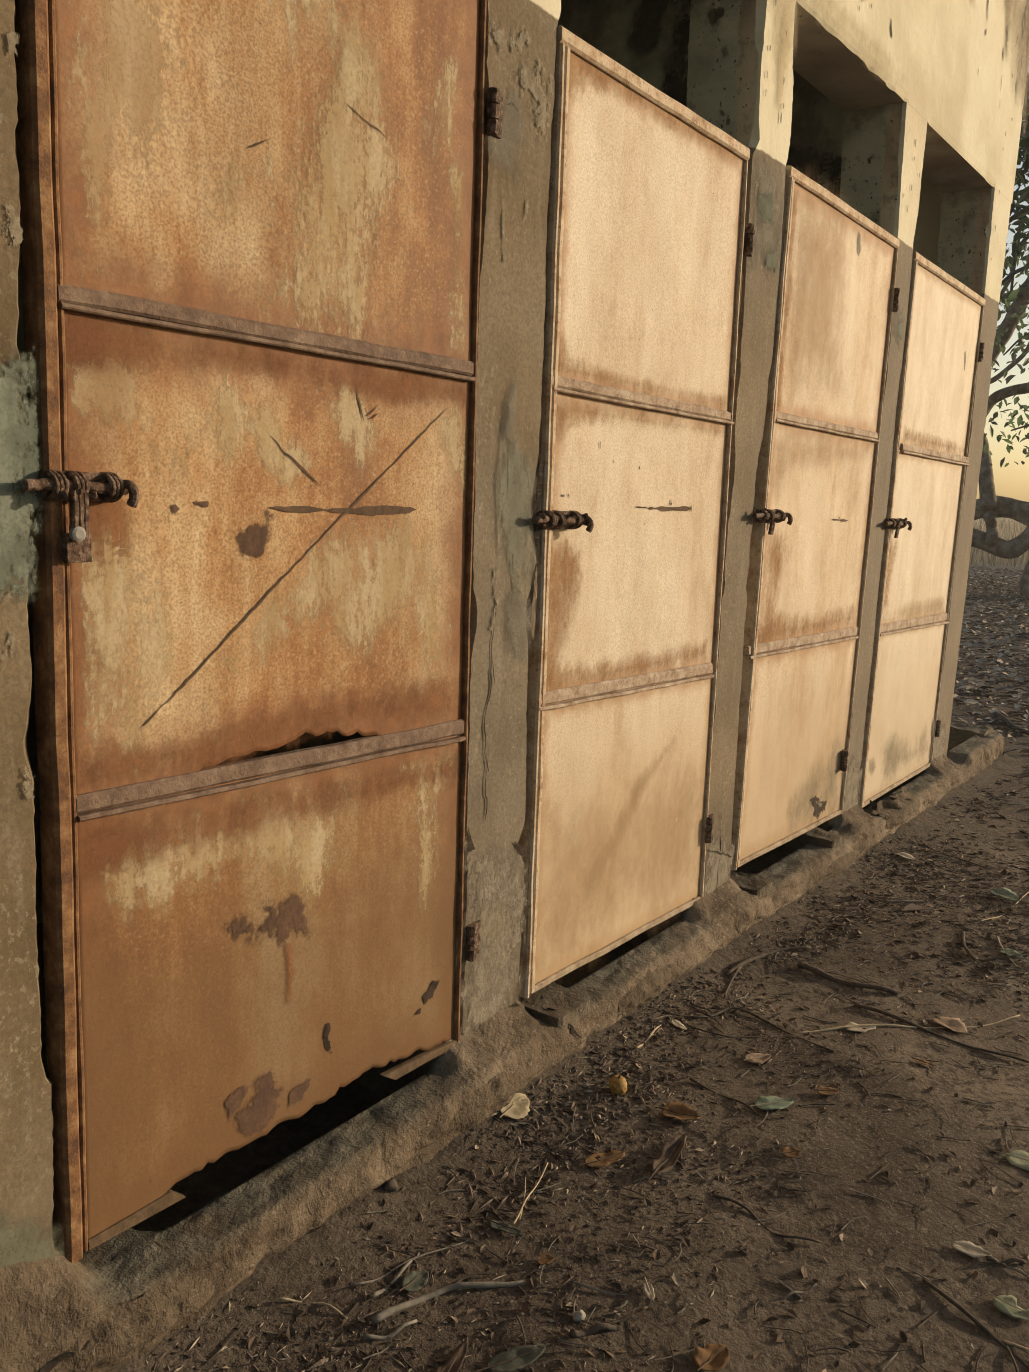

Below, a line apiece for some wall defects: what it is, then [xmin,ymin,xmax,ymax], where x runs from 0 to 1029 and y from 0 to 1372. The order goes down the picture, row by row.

peeling [6,31,18,56]
water stain [1001,0,1029,93]
peeling [5,201,23,250]
corrosion [67,314,160,366]
peeling [0,353,44,602]
corrosion [89,500,126,556]
corrosion [237,510,273,558]
crack [484,603,497,819]
peeling [22,766,35,799]
corrosion [226,894,309,996]
corrosion [415,980,439,1015]
corrosion [225,1071,311,1136]